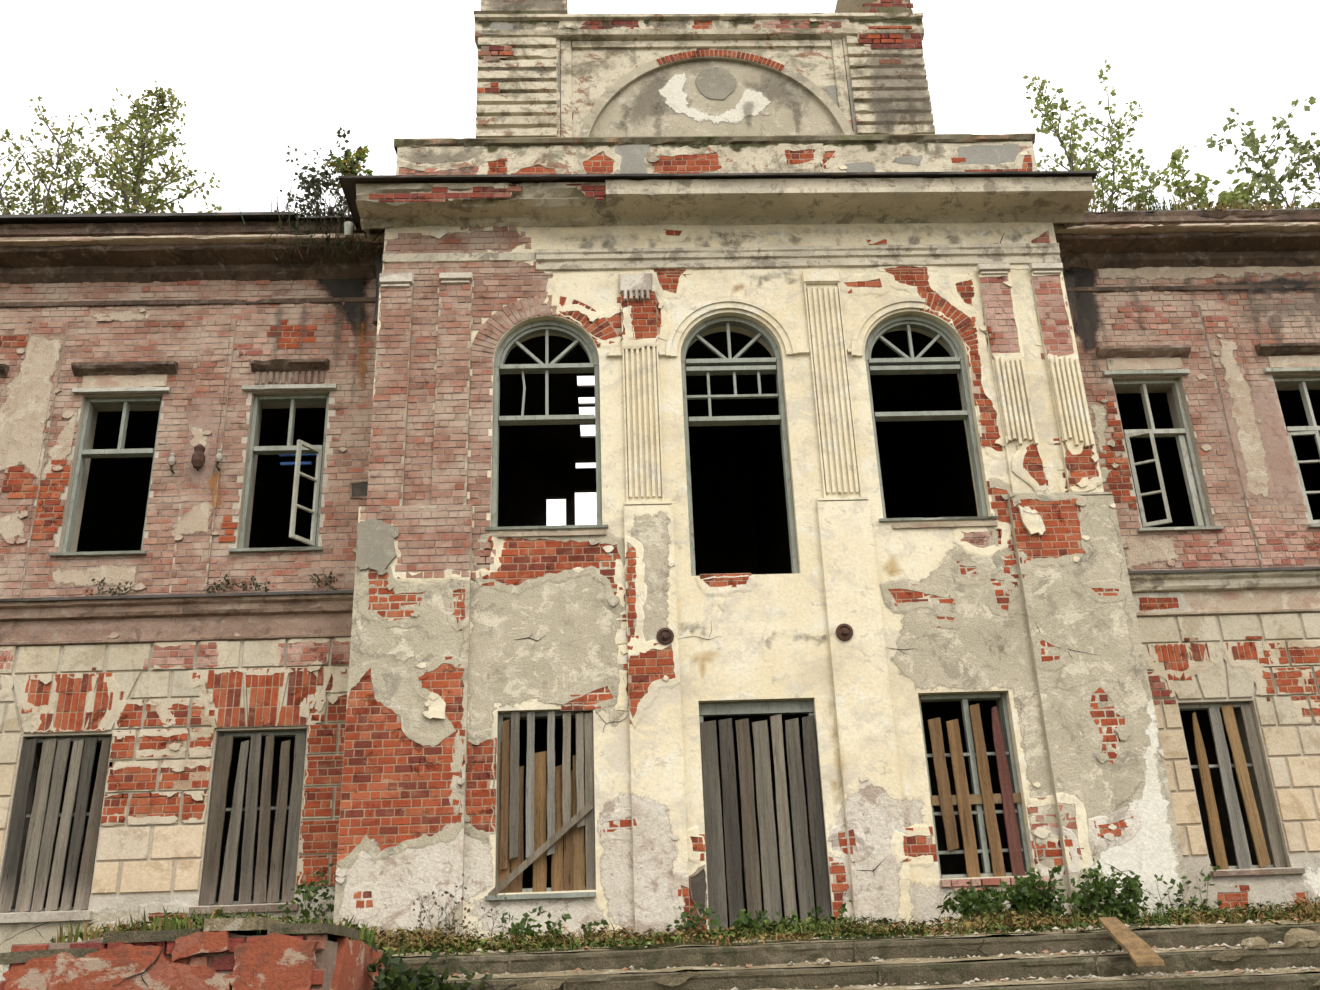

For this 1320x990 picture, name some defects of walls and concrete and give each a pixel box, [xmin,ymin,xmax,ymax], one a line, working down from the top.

flaking render [368,145,731,203]
peeling [894,155,923,166]
flaking render [0,224,710,939]
peeling [827,223,1320,929]
peeling [0,900,203,981]
crack [113,948,164,987]